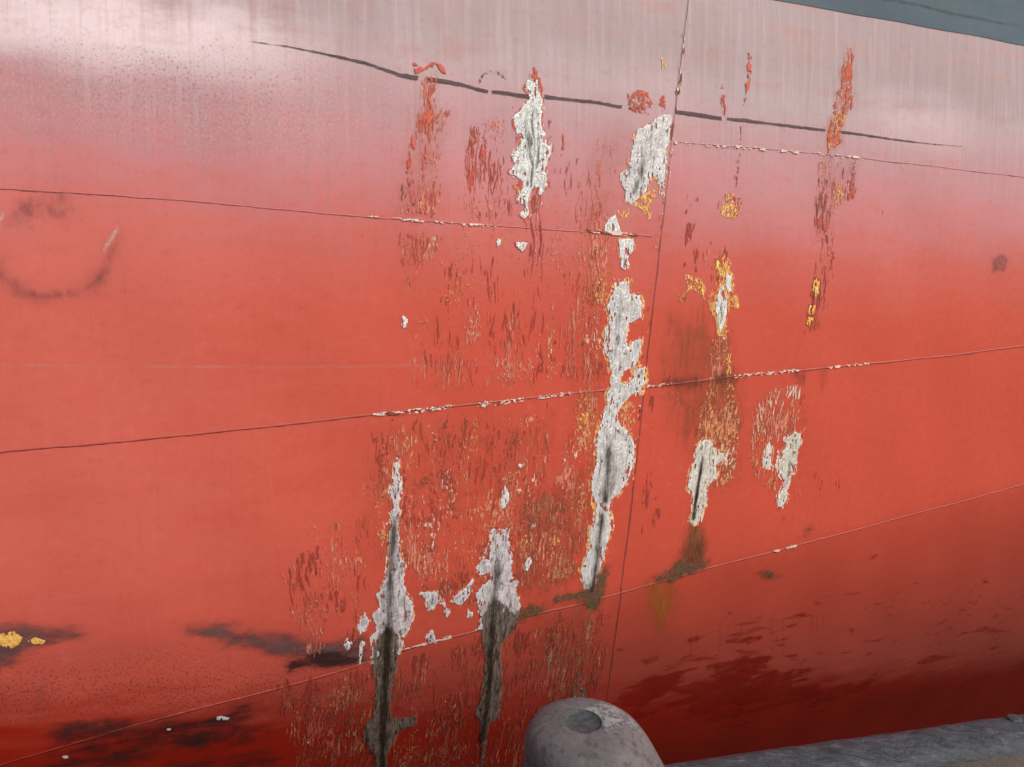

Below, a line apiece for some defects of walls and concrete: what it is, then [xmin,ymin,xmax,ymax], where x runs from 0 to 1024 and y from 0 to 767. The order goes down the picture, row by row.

corrosion [401,76,450,217]
peeling [507,79,554,222]
corrosion [523,67,544,102]
corrosion [804,48,857,334]
corrosion [282,117,616,656]
peeling [576,58,690,592]
peeling [344,458,532,767]
corrosion [683,522,704,563]
peeling [684,437,728,527]
peeling [761,431,803,509]
corrosion [277,669,377,767]
corrosion [390,605,611,767]